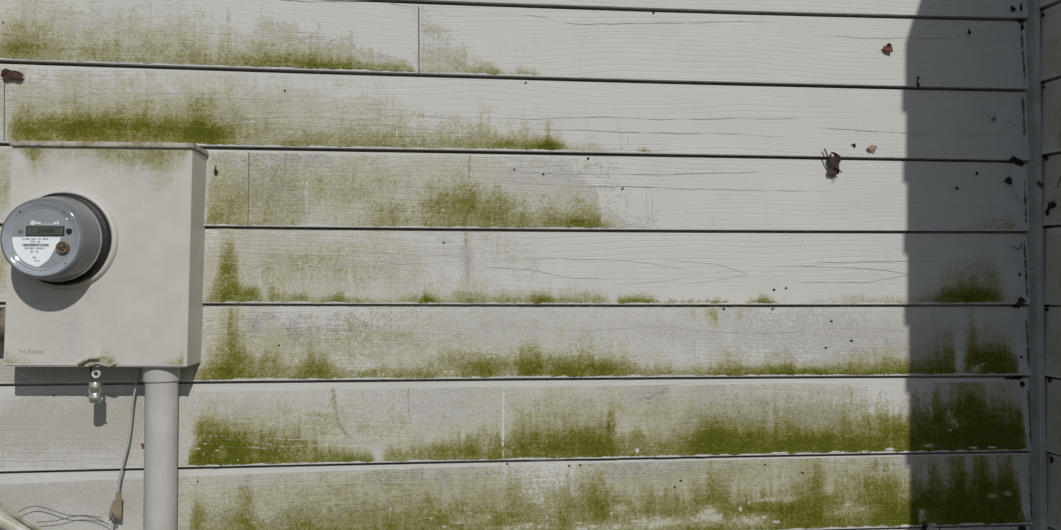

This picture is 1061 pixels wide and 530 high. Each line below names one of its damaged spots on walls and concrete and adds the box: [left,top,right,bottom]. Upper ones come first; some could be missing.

leakage [177,153,1029,530]
leakage [1041,0,1061,529]